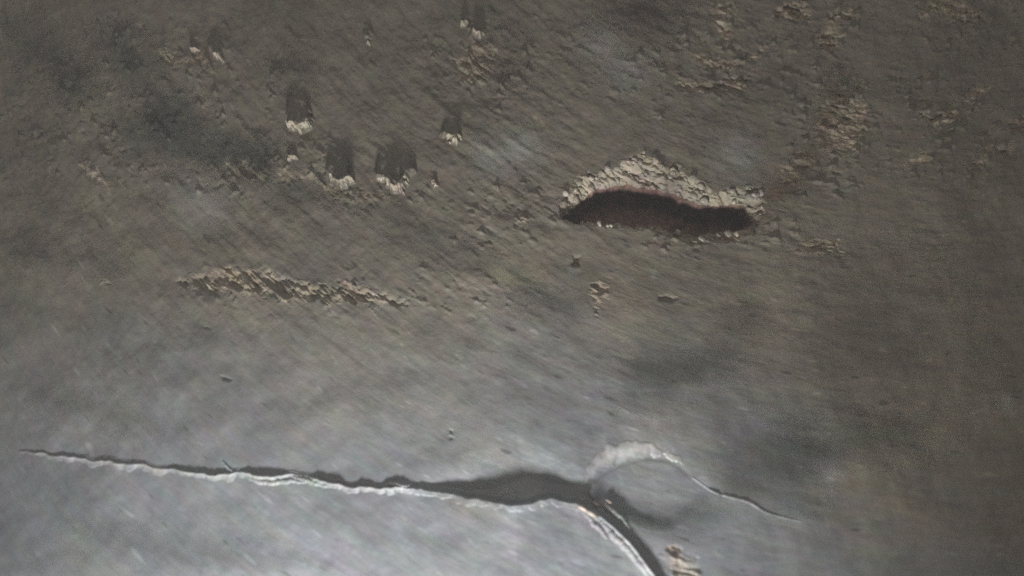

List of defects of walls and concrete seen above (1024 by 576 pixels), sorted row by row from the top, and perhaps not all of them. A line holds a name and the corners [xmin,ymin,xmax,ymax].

spalling [211,70,439,211]
peeling [439,105,462,145]
spalling [555,150,768,249]
spalling [169,264,417,313]
crack [19,449,659,576]